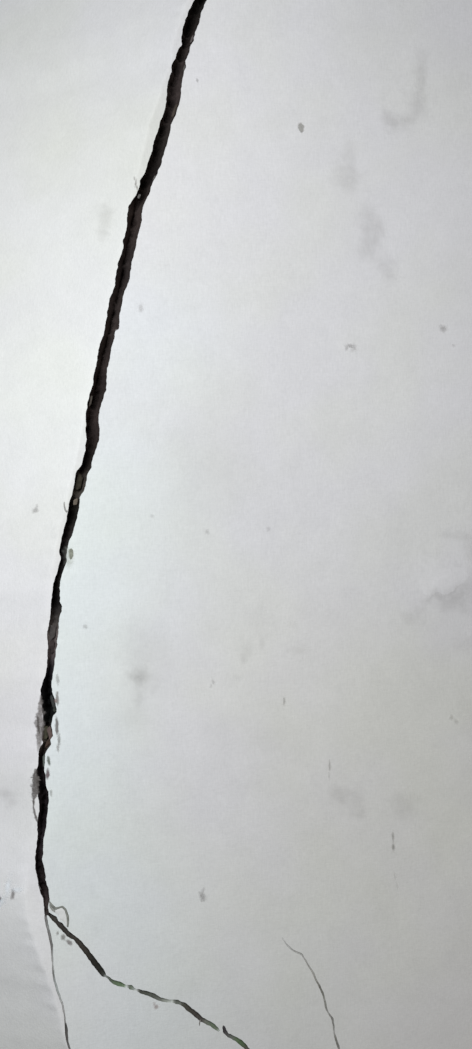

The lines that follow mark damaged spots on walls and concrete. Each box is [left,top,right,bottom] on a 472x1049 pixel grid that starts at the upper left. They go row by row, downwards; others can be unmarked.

crack [35,0,249,1049]
crack [282,938,340,1049]